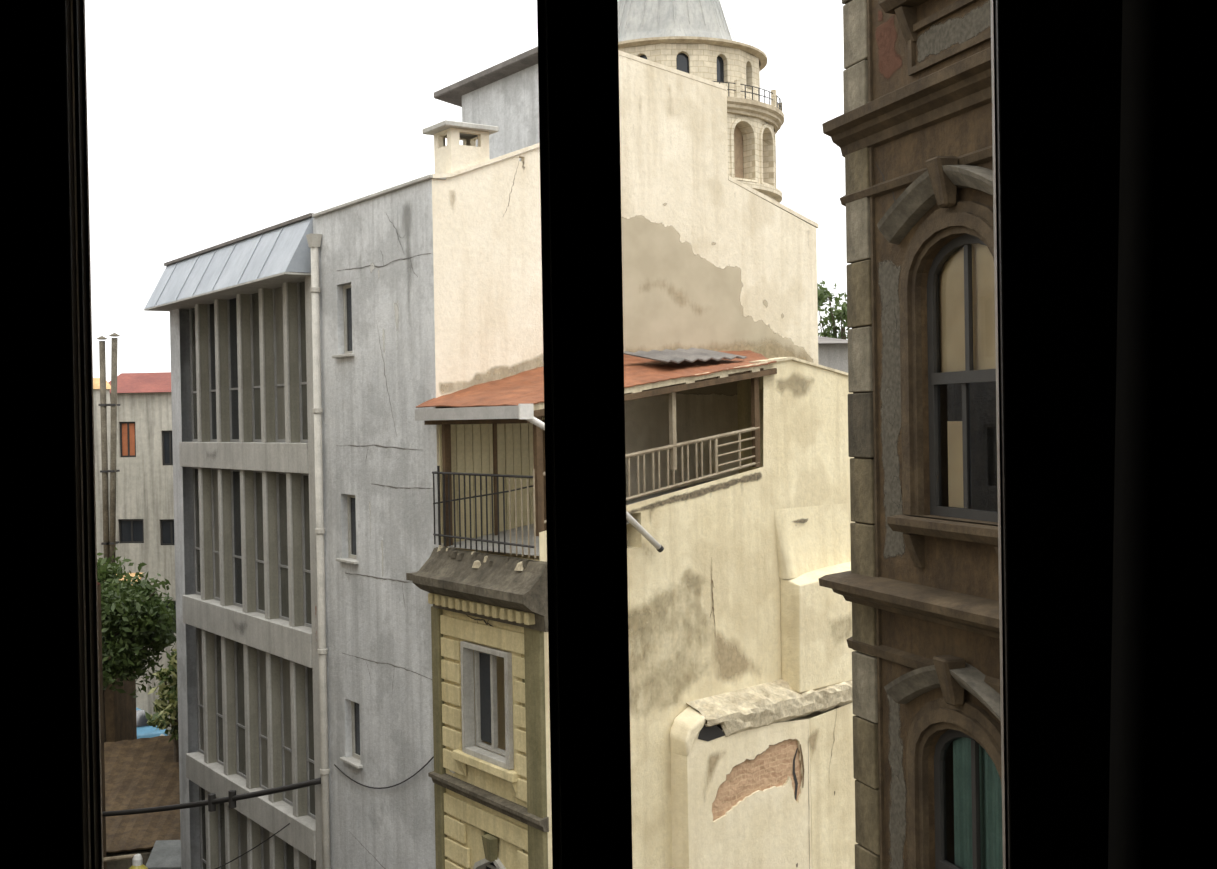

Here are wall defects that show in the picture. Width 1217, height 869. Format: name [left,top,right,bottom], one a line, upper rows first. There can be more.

crack [337,215,431,277]
flaking render [621,215,813,363]
flaking render [662,381,737,396]
damp [628,599,671,639]
damp [716,636,747,678]
flaking render [712,739,804,821]